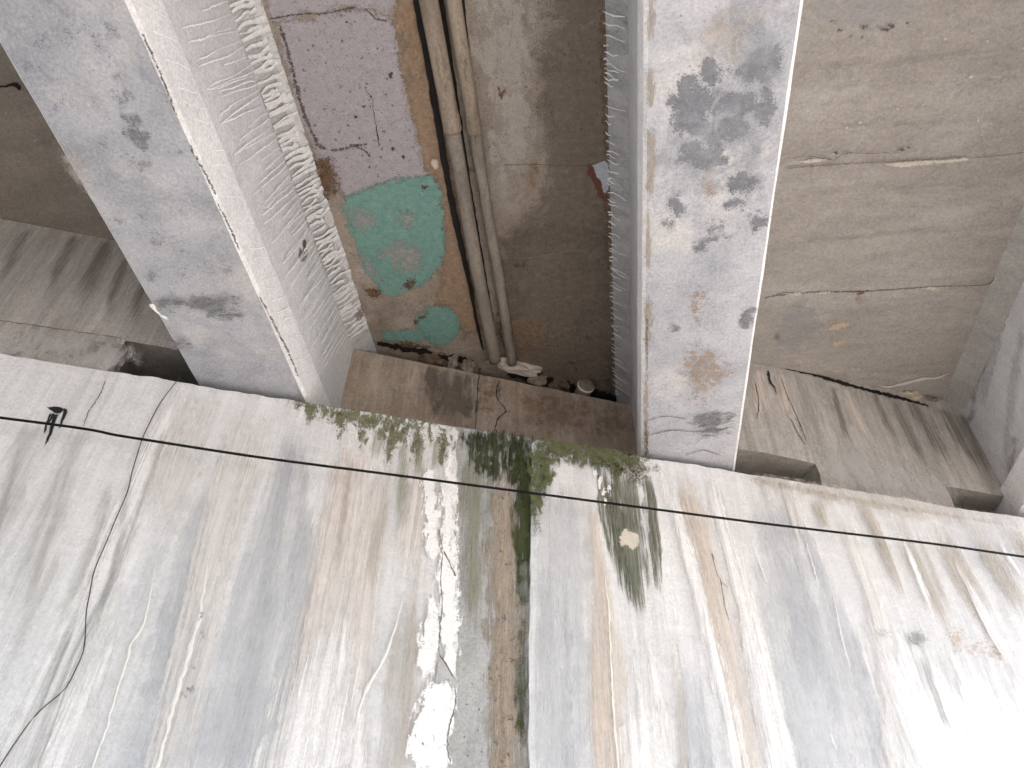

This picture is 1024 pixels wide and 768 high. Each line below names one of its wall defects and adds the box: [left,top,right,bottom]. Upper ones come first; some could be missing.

crack [788,152,1024,169]
crack [765,277,995,298]
crack [475,368,511,432]
crack [755,371,807,444]
water stain [879,403,986,467]
water stain [145,368,910,768]
peeling [405,451,463,768]
water stain [908,633,927,647]